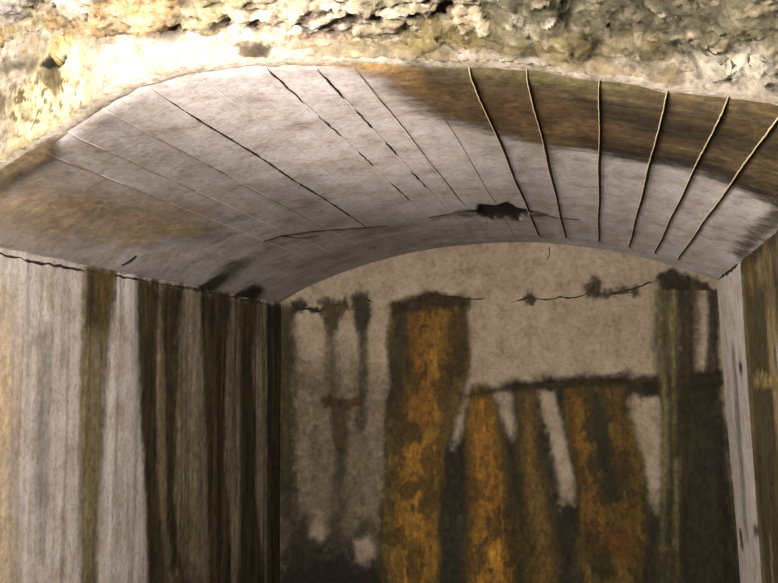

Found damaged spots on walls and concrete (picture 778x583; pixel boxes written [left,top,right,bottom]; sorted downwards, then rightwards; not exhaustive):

crack [115,90,382,242]
crack [266,67,340,136]
crack [317,70,372,128]
crack [353,66,459,199]
spalling [428,202,579,221]
crack [658,38,749,55]
damp [317,34,778,583]
crack [517,293,586,301]
damp [80,267,114,583]
damp [137,279,388,583]
corrosion [379,292,556,583]
corrosion [564,384,648,583]